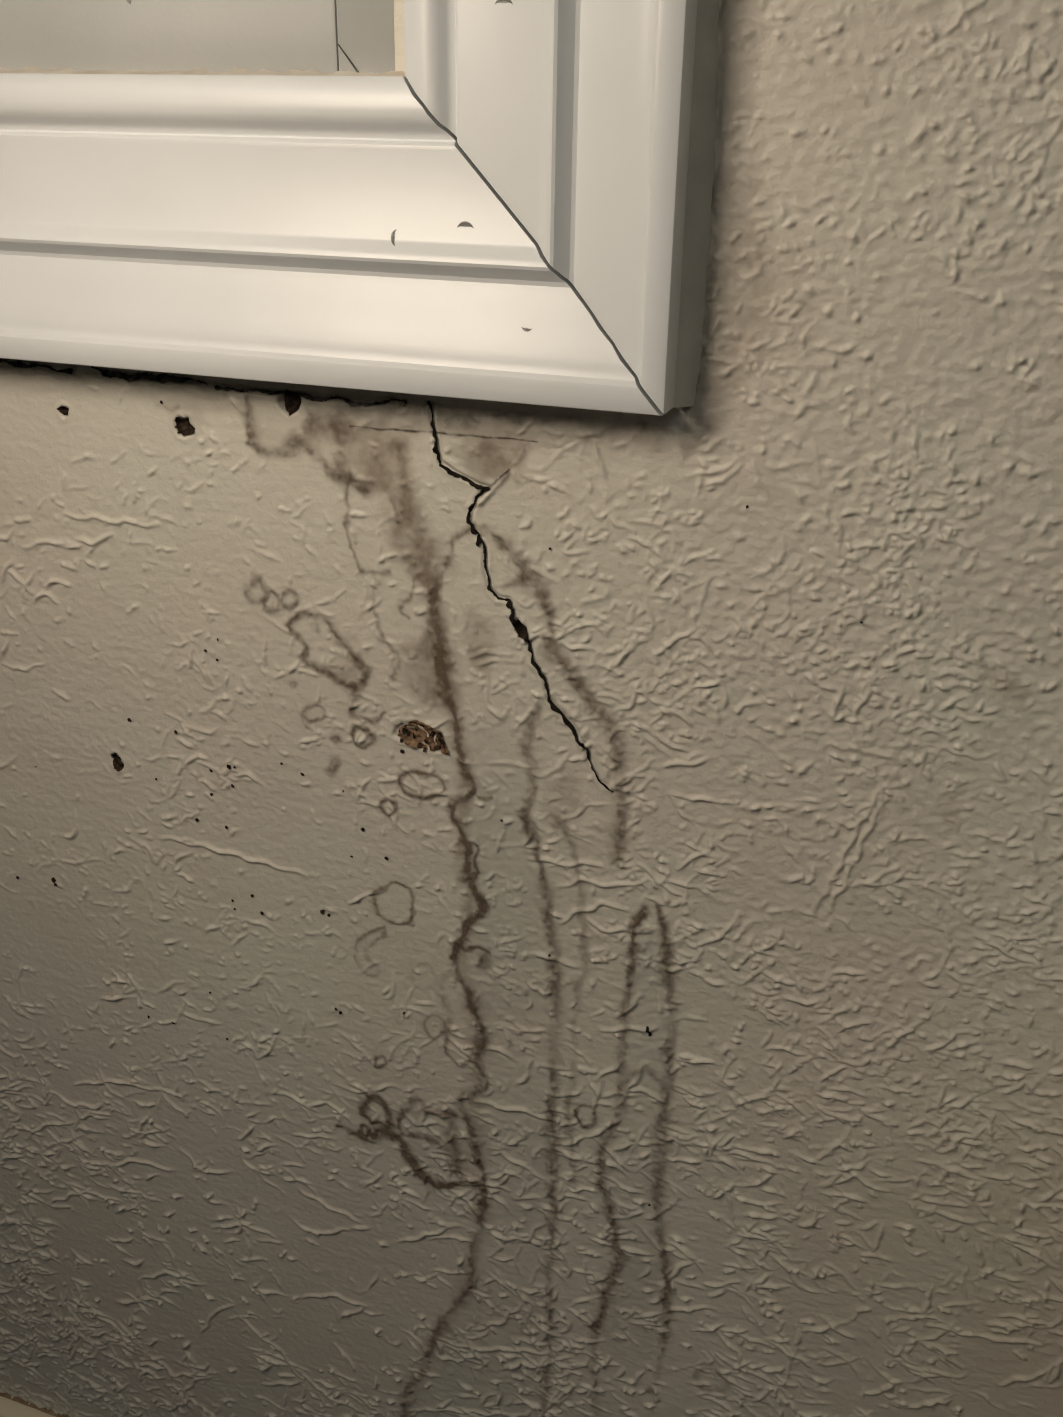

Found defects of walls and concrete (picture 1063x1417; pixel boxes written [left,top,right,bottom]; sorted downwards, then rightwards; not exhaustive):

leakage [330,472,368,496]
crack [0,358,614,792]
leakage [287,612,365,712]
peeling [398,719,449,755]
leakage [495,536,591,701]
leakage [336,541,489,1209]
leakage [519,808,557,991]
leakage [621,905,671,1016]
leakage [590,1125,620,1333]
leakage [659,1235,671,1339]